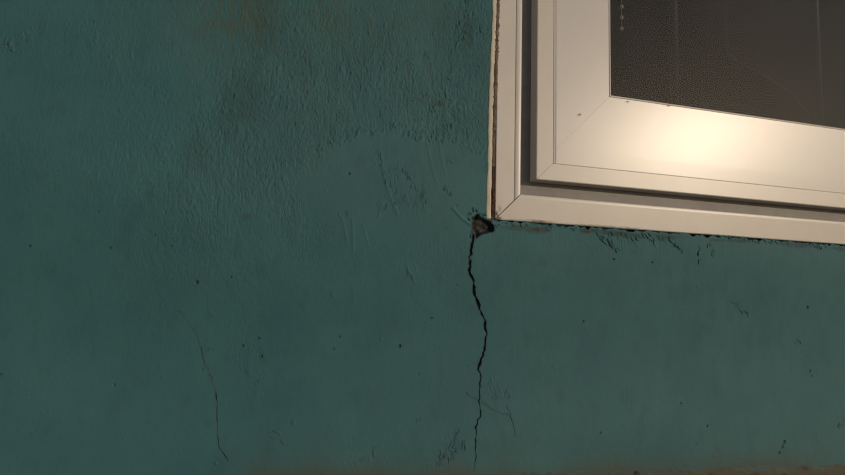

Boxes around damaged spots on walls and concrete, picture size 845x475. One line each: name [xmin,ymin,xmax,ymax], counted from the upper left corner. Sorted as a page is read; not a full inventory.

crack [466,234,516,472]
spalling [468,207,683,261]